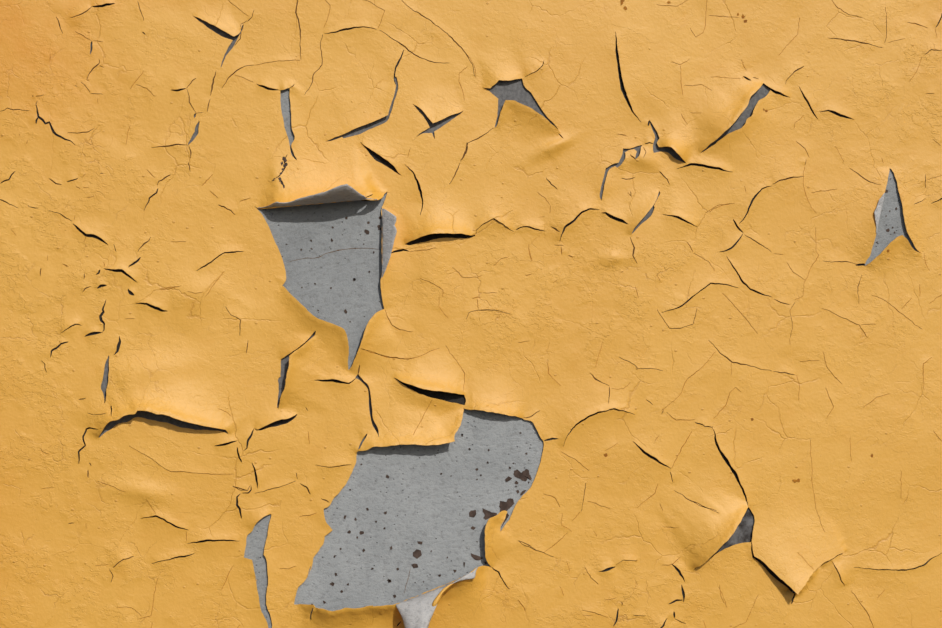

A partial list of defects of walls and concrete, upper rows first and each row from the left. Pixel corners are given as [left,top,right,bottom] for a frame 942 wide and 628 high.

crack [0,95,95,148]
crack [75,398,125,492]
crack [56,0,145,101]
crack [0,169,254,375]
crack [96,408,367,628]
crack [130,0,477,215]
peeling [74,69,544,628]
crack [315,345,465,394]
peeling [413,57,573,158]
crack [517,339,842,628]
crack [420,18,942,341]
peeling [840,141,942,289]